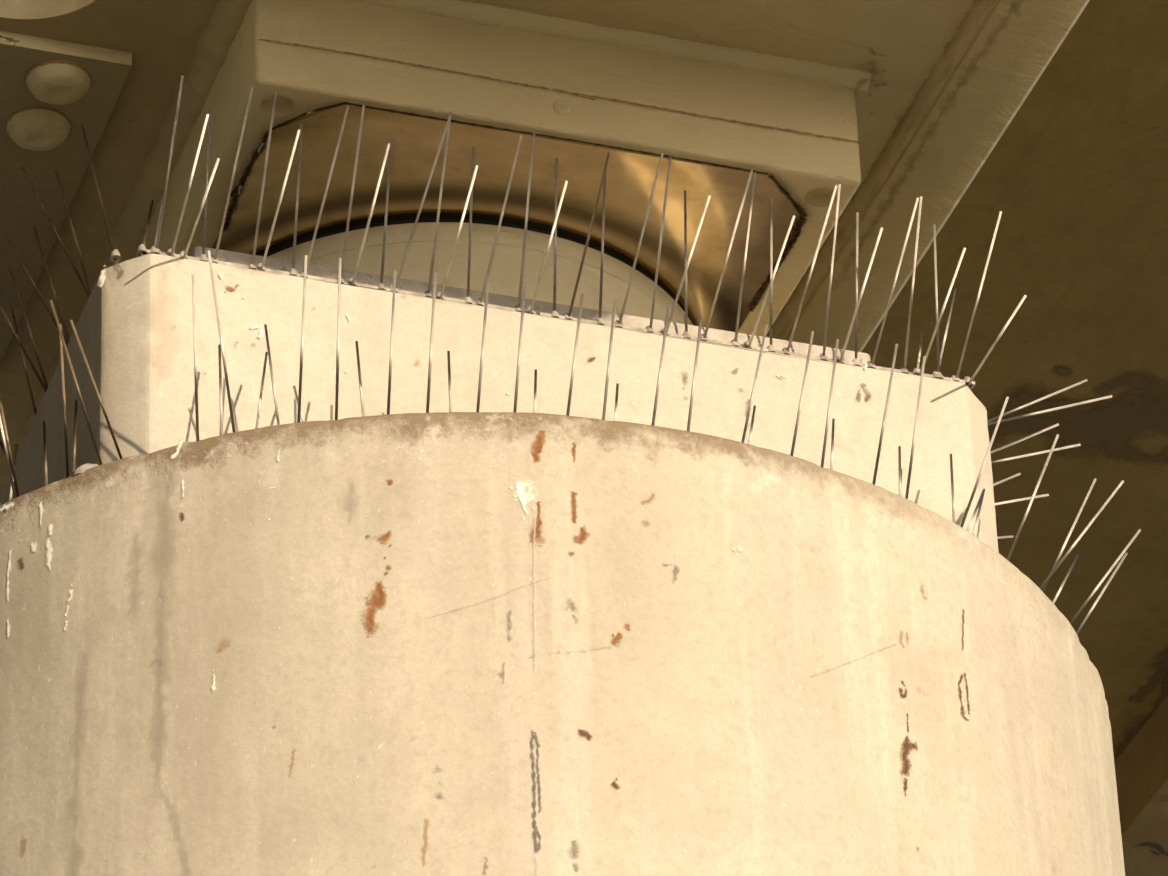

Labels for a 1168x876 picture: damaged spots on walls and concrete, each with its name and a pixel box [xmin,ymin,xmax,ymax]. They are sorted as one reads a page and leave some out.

corrosion [531,431,546,461]
leakage [987,375,1168,463]
corrosion [529,501,543,542]
corrosion [569,491,589,556]
corrosion [363,531,391,633]
corrosion [958,673,970,721]
leakage [1114,650,1168,760]
crack [530,731,541,852]
corrosion [902,713,918,796]